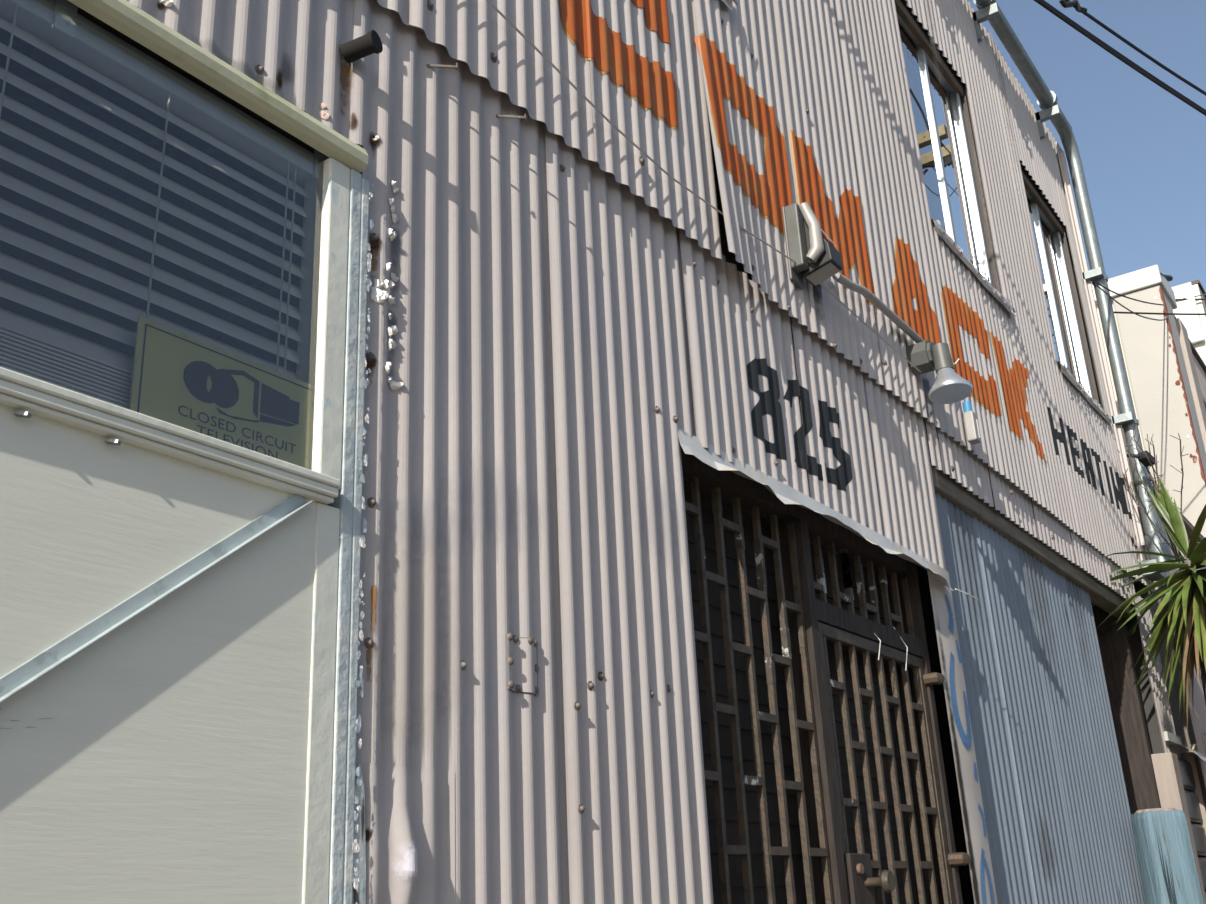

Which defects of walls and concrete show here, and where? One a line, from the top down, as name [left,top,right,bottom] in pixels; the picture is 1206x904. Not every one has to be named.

peeling [364,220,404,390]
peeling [359,407,370,548]
peeling [357,573,365,697]